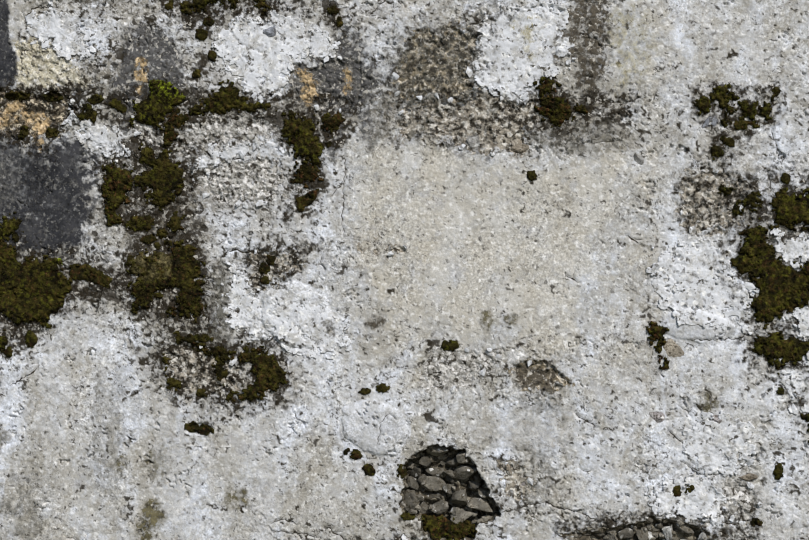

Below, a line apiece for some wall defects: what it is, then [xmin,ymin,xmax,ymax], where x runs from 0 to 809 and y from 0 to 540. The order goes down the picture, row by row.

damp [110,22,185,134]
damp [553,0,611,102]
damp [280,195,299,224]
damp [193,267,232,351]
damp [700,392,719,412]
spalling [398,444,501,540]
flaking render [497,459,537,503]
peeling [560,410,770,540]